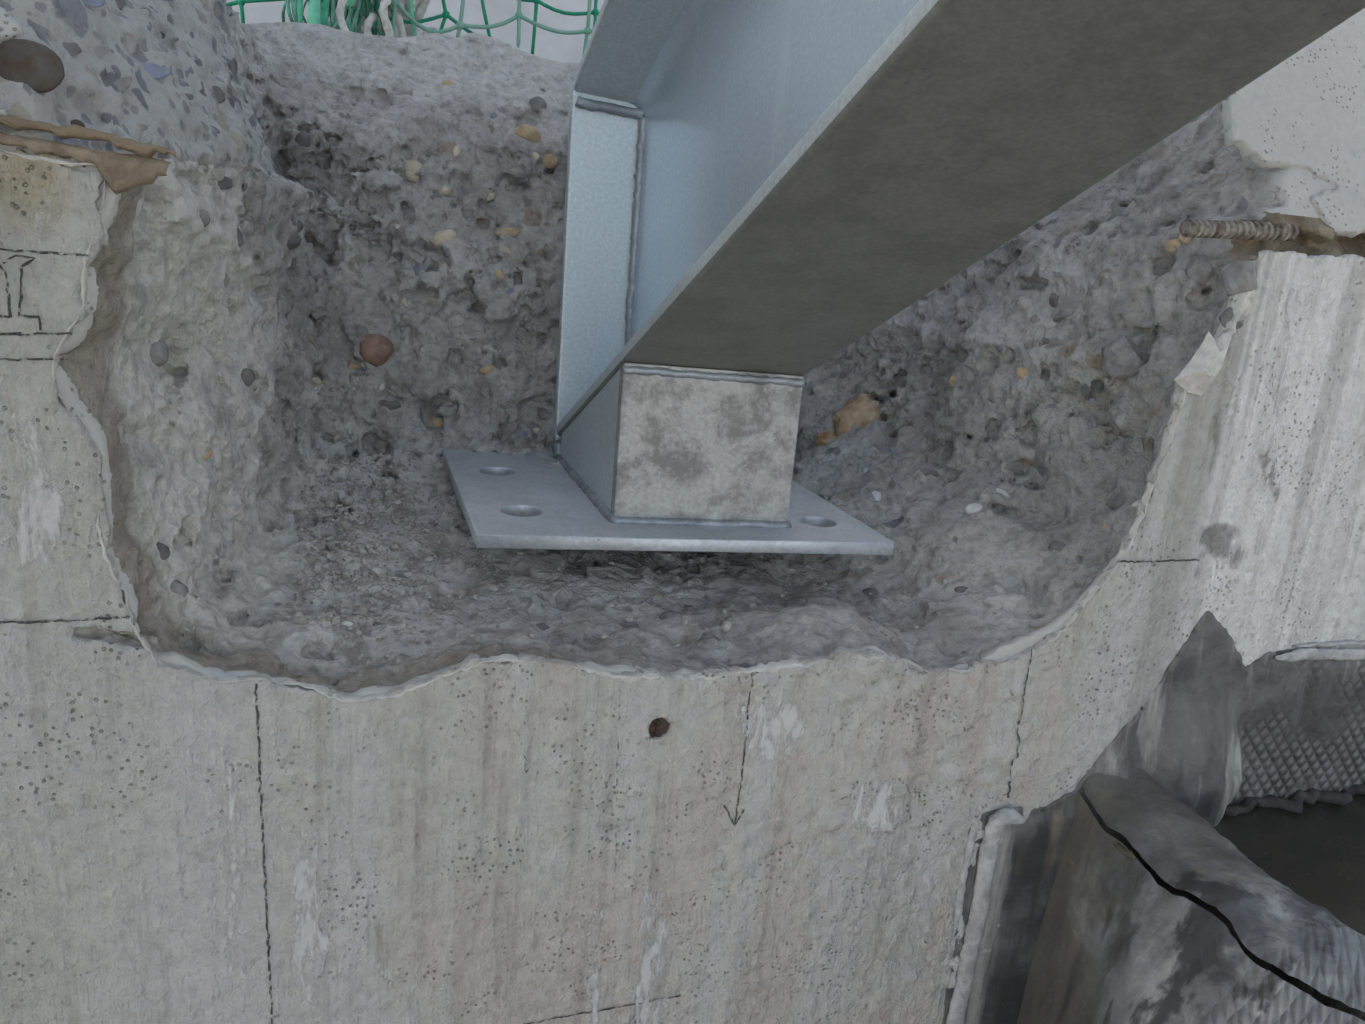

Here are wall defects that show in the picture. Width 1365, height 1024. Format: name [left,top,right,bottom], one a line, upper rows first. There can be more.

spalling [0,0,1299,703]